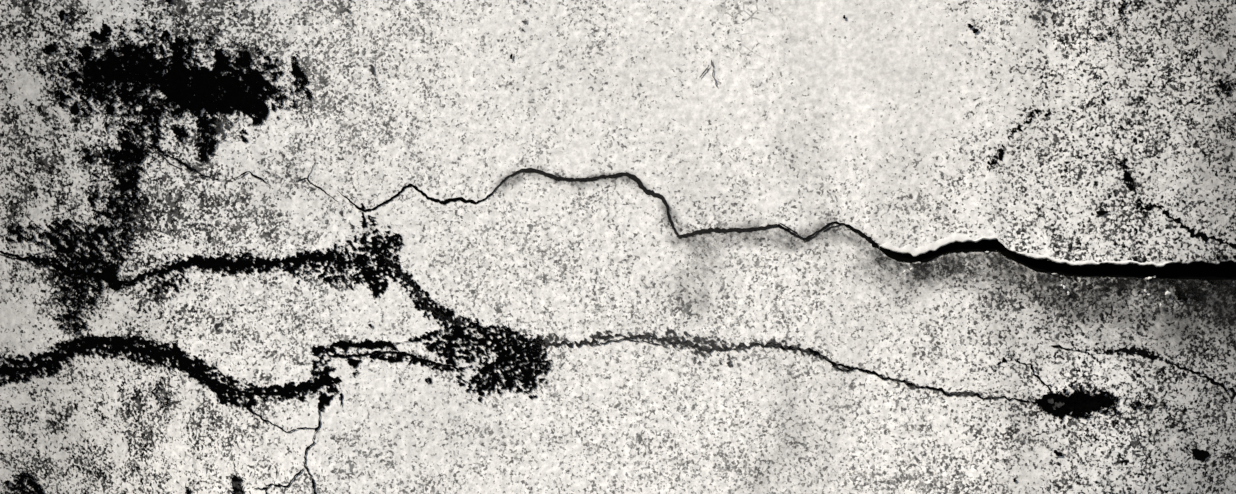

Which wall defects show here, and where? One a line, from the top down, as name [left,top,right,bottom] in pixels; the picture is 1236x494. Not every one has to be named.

crack [987,95,1110,171]
crack [147,142,1236,307]
crack [0,241,480,494]
crack [532,328,1236,404]